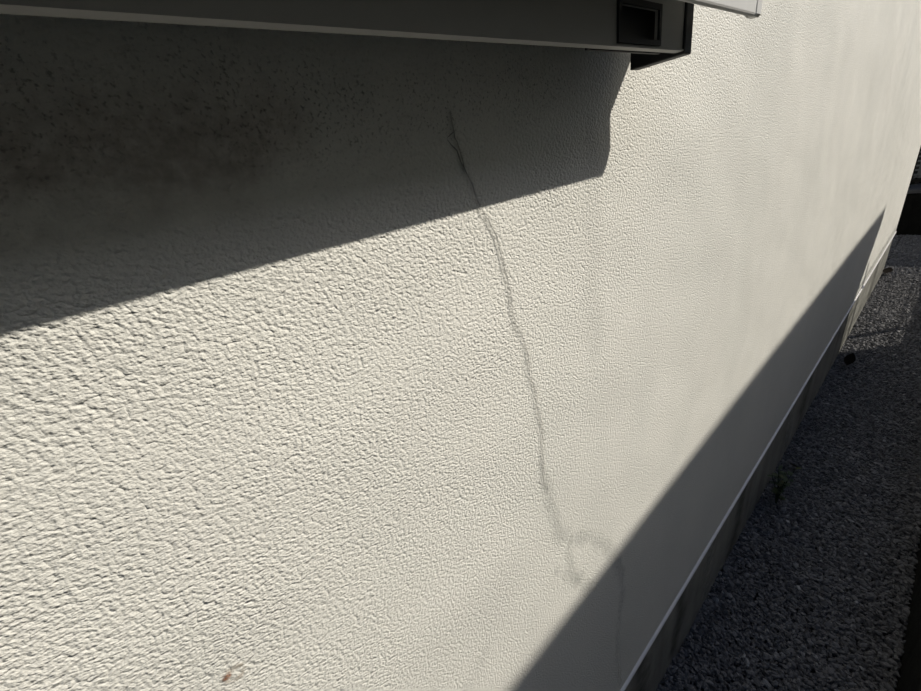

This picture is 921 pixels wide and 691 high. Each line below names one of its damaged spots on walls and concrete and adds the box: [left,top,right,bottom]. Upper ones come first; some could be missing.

crack [447,119,543,450]